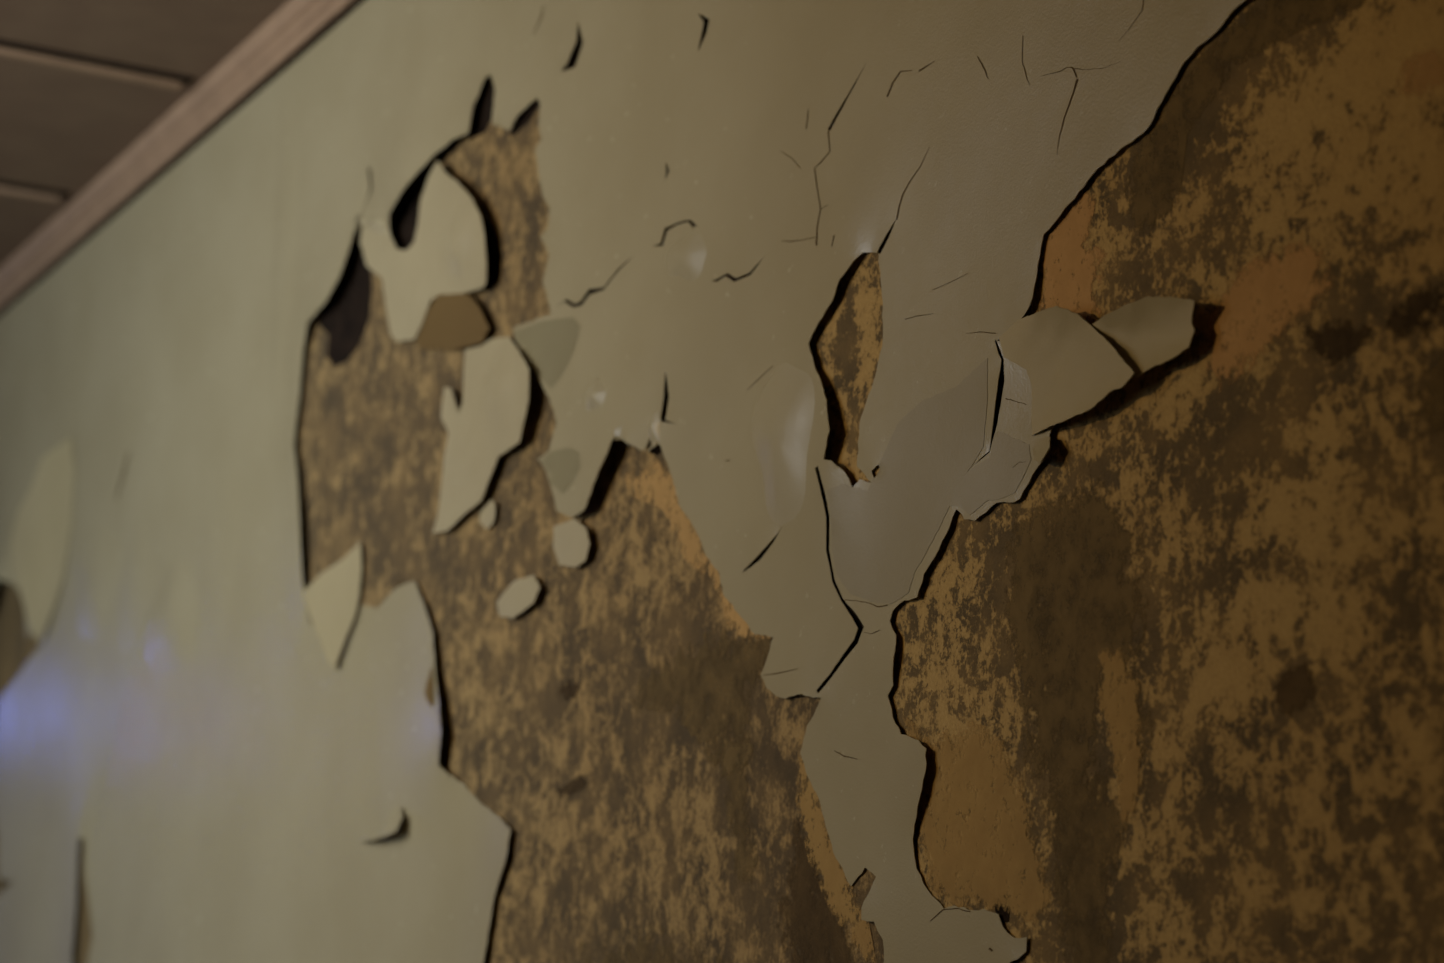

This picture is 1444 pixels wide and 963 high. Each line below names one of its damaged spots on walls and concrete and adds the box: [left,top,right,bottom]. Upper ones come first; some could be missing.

crack [699,15,709,48]
crack [1022,4,1143,151]
crack [713,61,934,282]
crack [560,220,697,307]
damp [1306,283,1444,372]
peeling [294,106,884,963]
peeling [888,0,1444,963]
damp [994,478,1154,963]
damp [1274,664,1315,718]